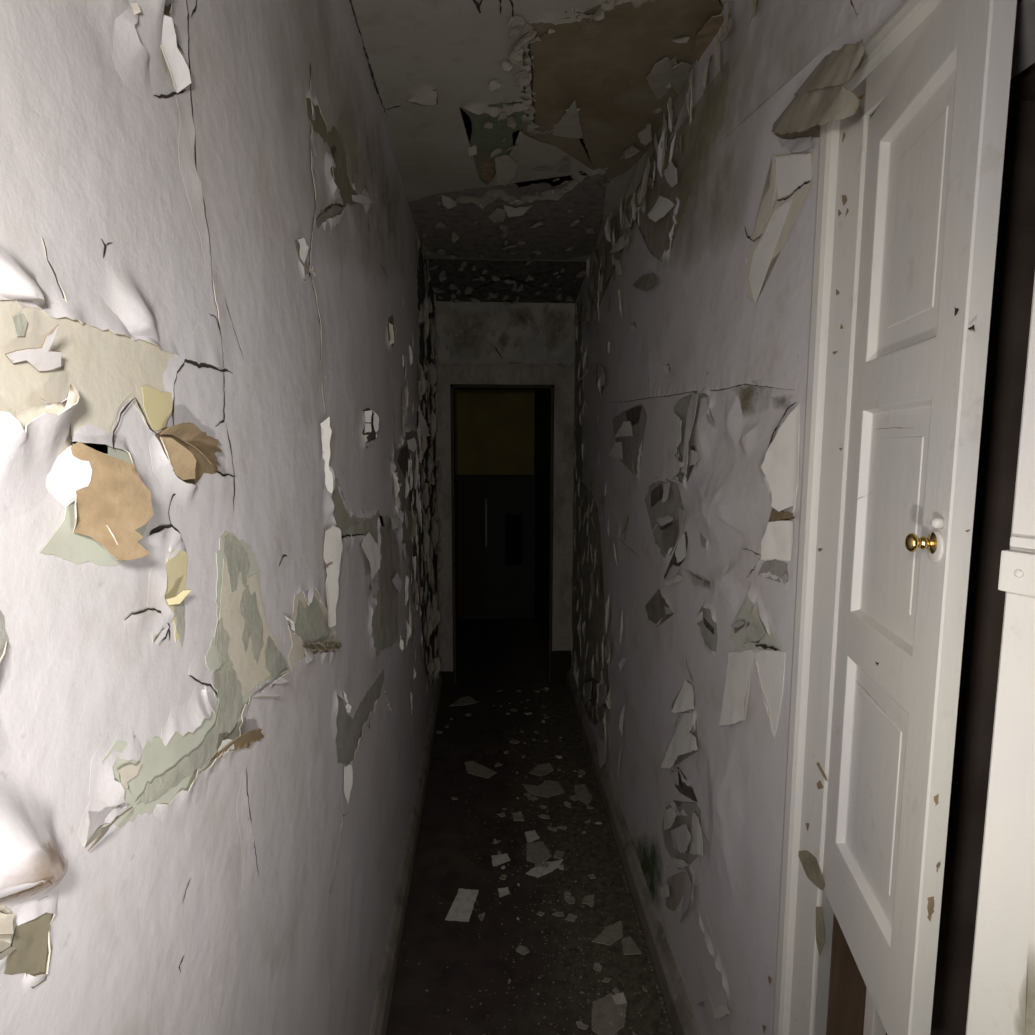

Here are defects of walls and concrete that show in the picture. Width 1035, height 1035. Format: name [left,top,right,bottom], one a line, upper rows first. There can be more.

crack [154,0,243,505]
crack [349,0,401,114]
peeling [745,39,866,304]
peeling [0,611,12,695]
peeling [0,277,222,648]
peeling [78,0,733,851]
peeling [694,402,800,738]
peeling [0,882,61,995]
peeling [659,660,731,1019]